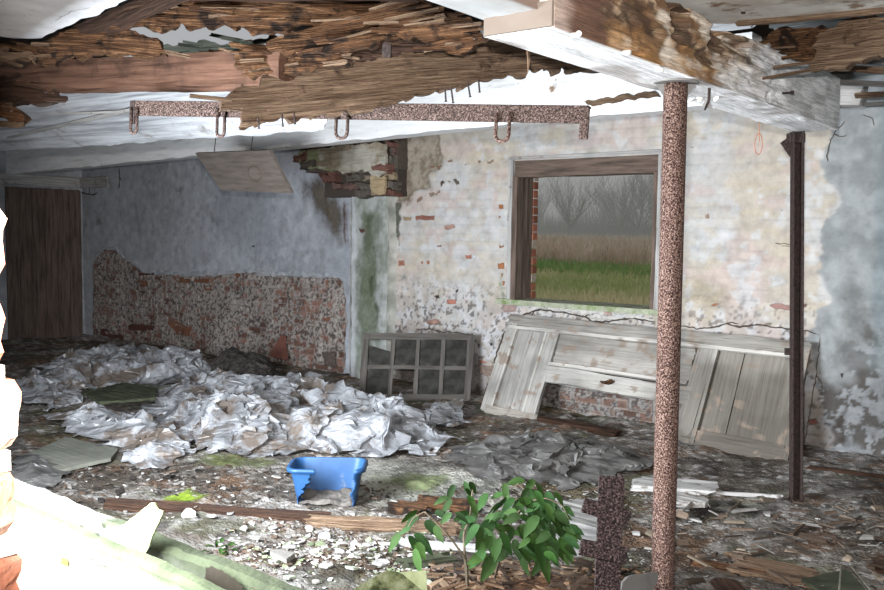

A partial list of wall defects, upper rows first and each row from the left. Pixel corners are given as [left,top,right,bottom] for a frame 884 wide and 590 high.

spalling [293,138,408,199]
flaking render [92,246,347,374]
crack [523,309,654,323]
crack [484,330,506,395]